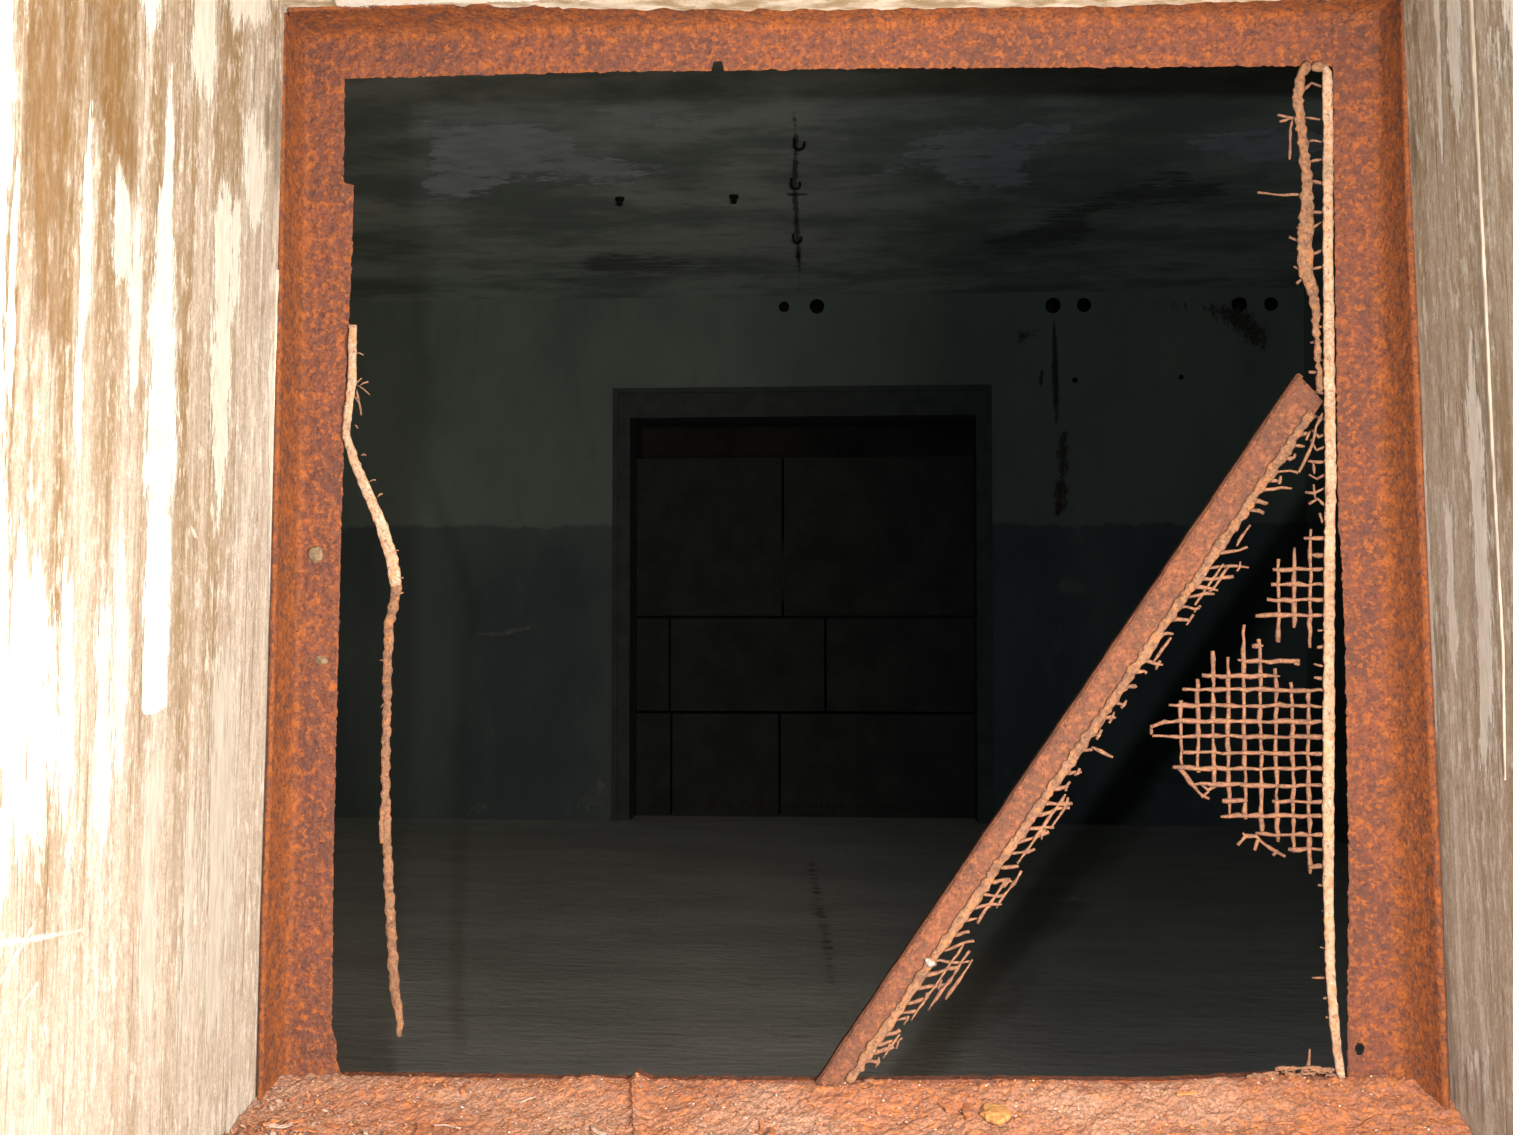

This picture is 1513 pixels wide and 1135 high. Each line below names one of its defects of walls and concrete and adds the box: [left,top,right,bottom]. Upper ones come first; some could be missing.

leakage [1434,0,1463,165]
leakage [0,0,180,912]
leakage [208,107,267,536]
rust [307,546,324,563]
leakage [1423,328,1495,784]
leakage [137,738,164,1045]
leakage [176,633,241,1078]
leakage [1463,1034,1505,1116]